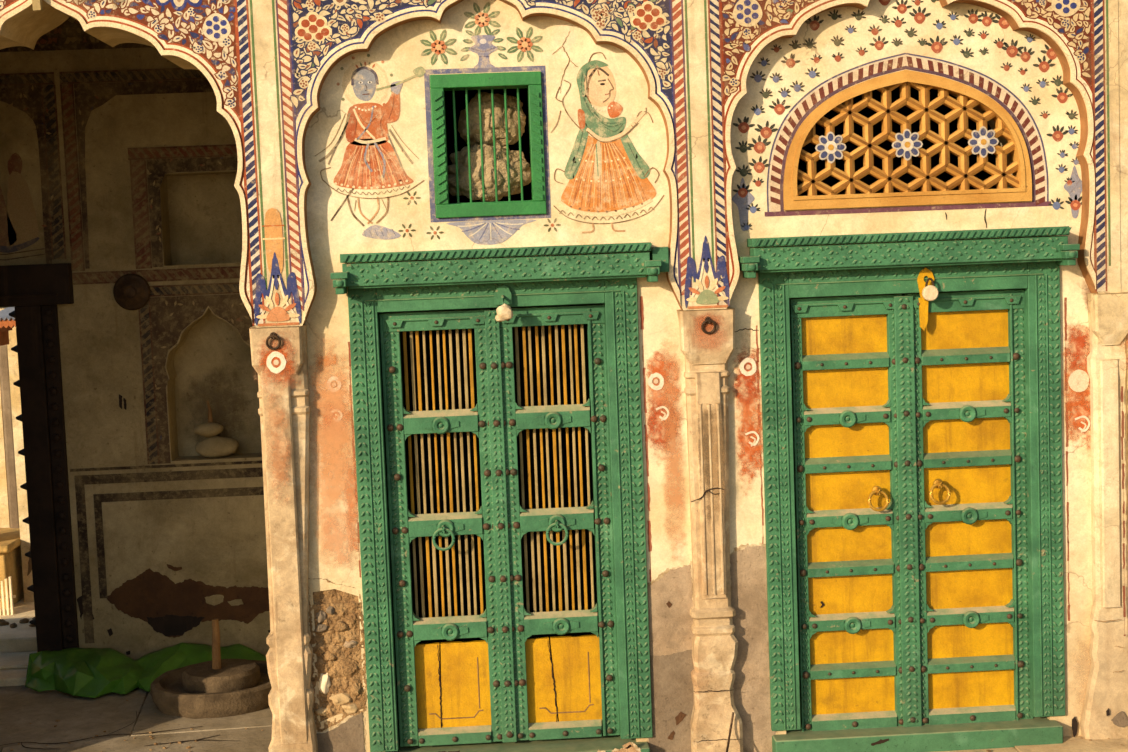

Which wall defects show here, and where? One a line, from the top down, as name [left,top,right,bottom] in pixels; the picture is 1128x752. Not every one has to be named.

crack [691,488,724,502]
flaking render [107,564,270,640]
flaking render [647,561,694,656]
flaking render [308,578,367,732]
peeling [597,742,641,752]